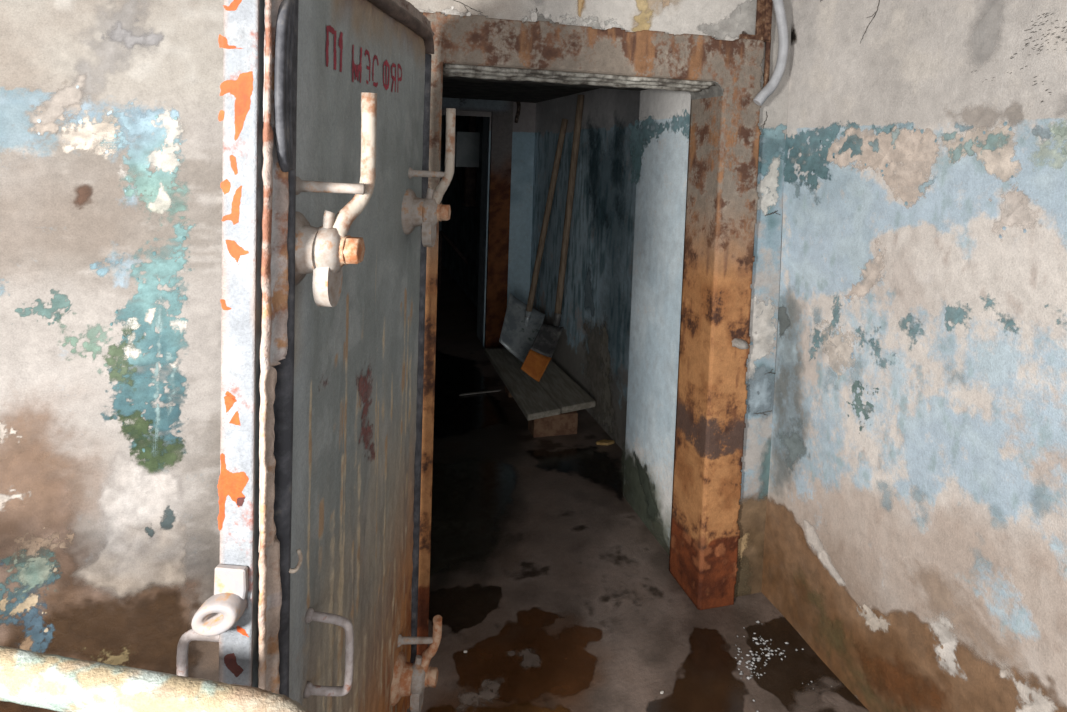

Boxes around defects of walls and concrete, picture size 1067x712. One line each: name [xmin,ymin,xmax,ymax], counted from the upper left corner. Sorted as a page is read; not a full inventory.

peeling [218,71,253,141]
peeling [148,109,184,214]
peeling [220,155,242,225]
peeling [820,122,1038,238]
leakage [778,306,790,336]
leakage [152,344,176,456]
peeling [0,527,74,616]
leakage [0,417,199,677]
leakage [734,423,1067,712]
leakage [0,701,59,712]
peeling [930,614,967,678]
peeling [1000,664,1056,712]